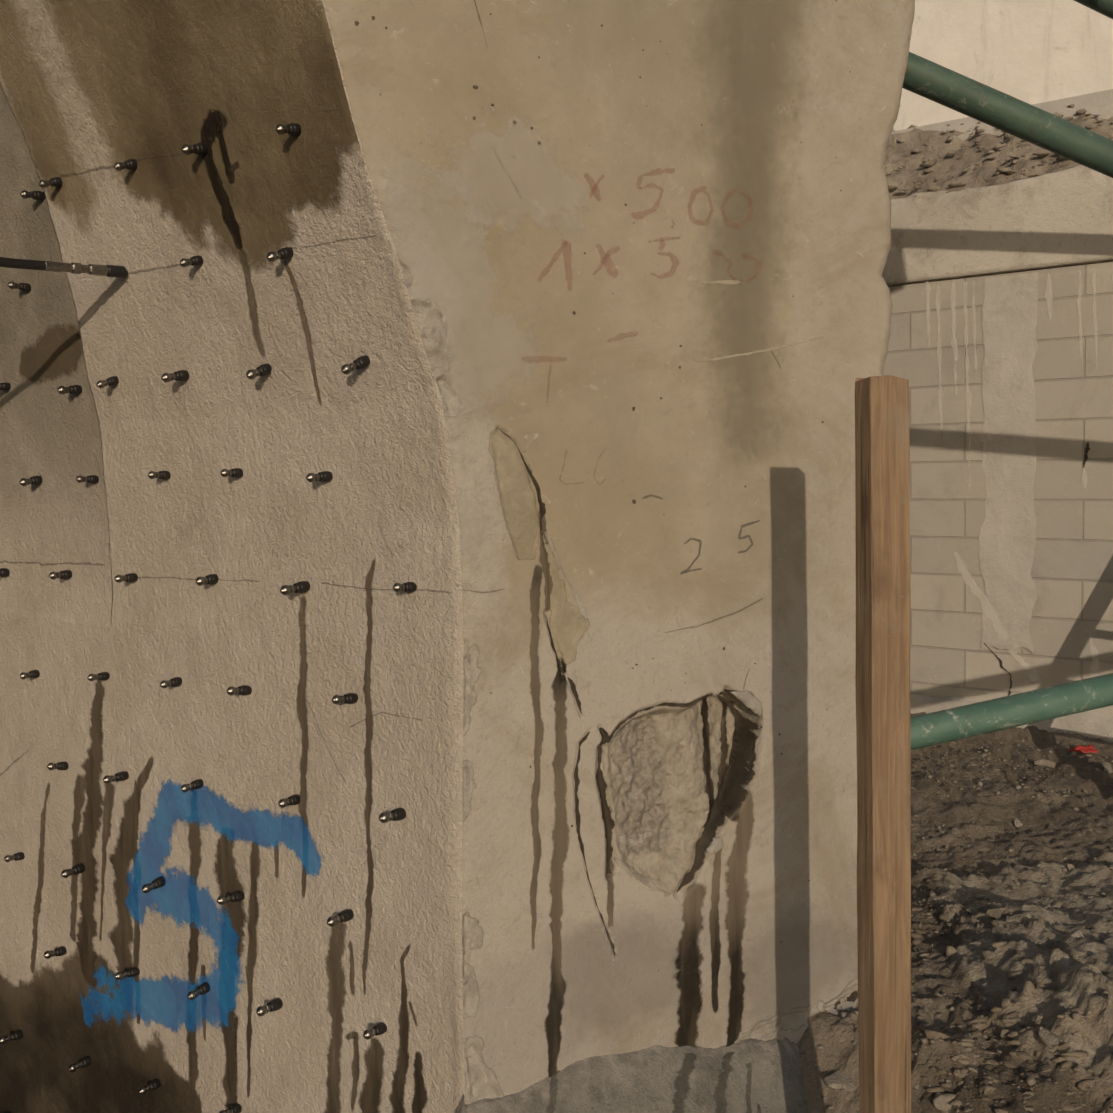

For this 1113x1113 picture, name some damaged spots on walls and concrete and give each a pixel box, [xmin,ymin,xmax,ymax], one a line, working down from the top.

water stain [0,0,88,217]
water stain [51,0,359,405]
water stain [19,324,82,383]
water stain [0,682,260,1113]
water stain [530,512,569,1113]
crack [568,678,615,955]
water stain [606,842,614,927]
spalling [596,689,763,897]
water stain [673,785,761,1113]
crack [984,643,1012,696]